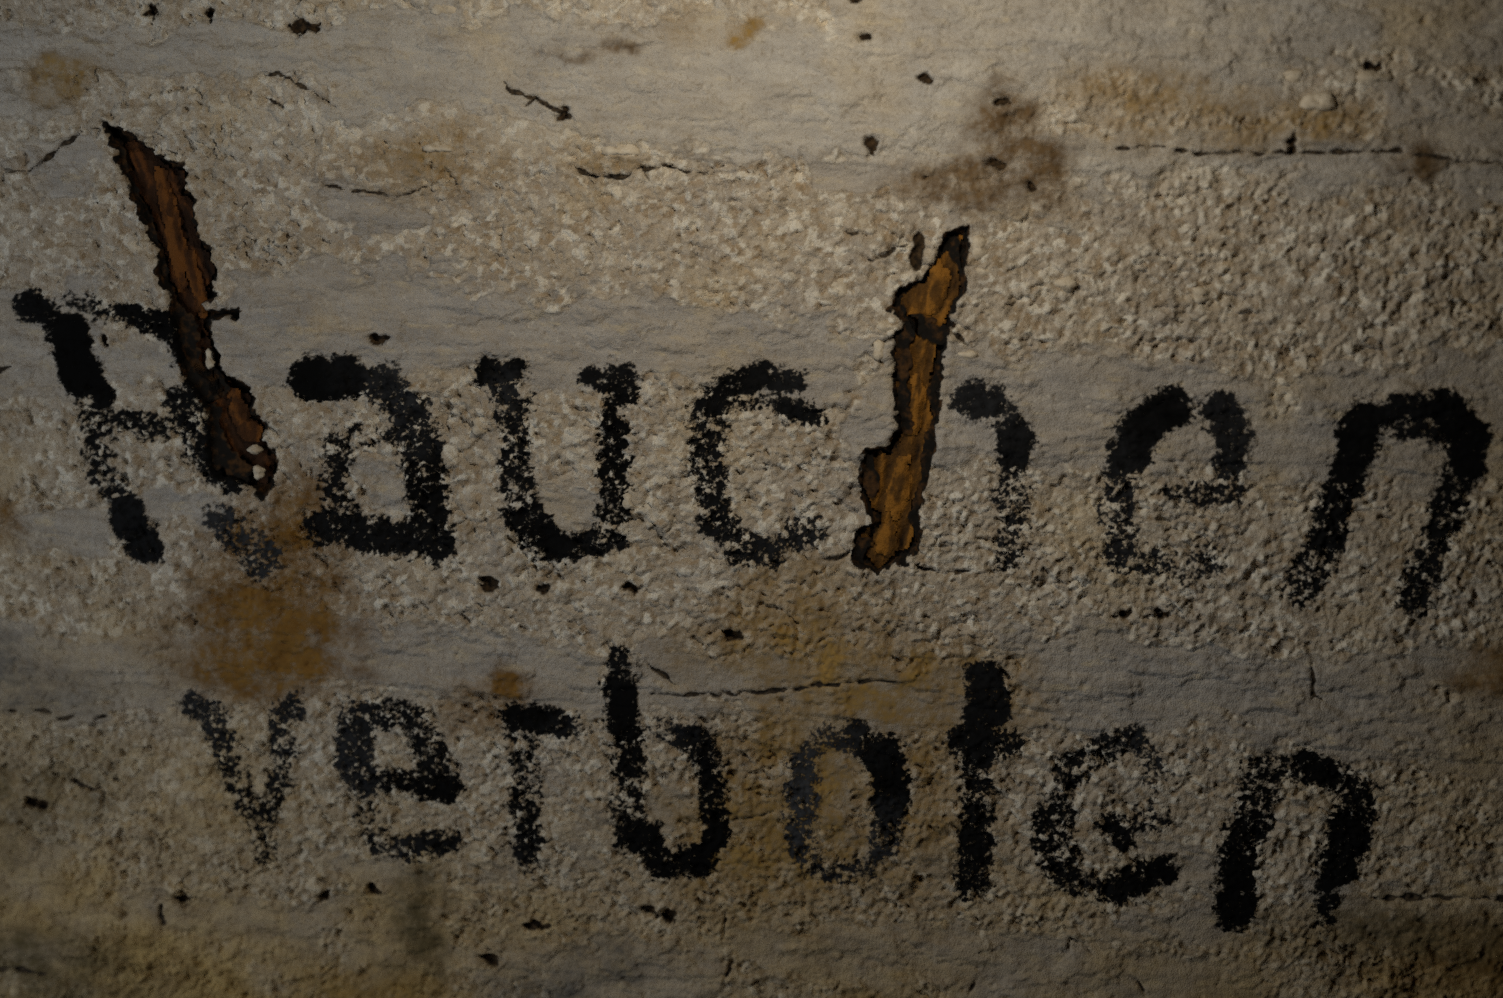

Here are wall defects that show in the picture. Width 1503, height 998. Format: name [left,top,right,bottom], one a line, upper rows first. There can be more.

spalling [0,66,929,361]
spalling [923,133,1503,395]
crack [1115,145,1500,164]
spalling [0,382,111,637]
spalling [262,363,1503,676]
spalling [0,674,1477,985]